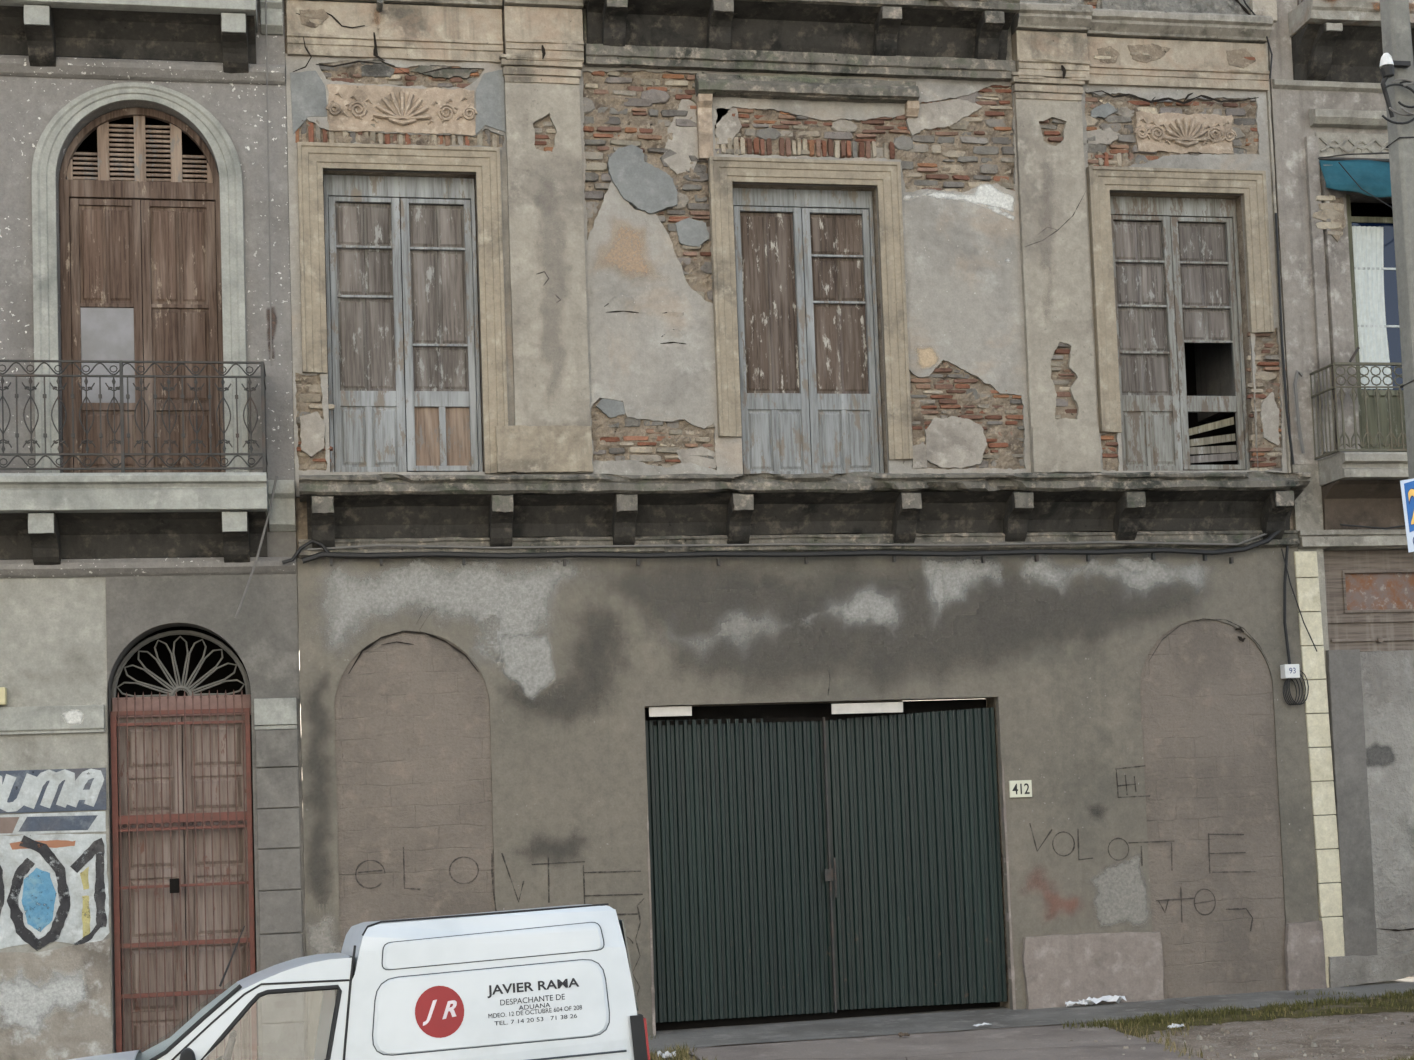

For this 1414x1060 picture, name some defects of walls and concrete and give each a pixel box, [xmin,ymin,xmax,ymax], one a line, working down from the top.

flaking render [319,60,484,88]
flaking render [295,119,504,147]
flaking render [1039,119,1065,146]
flaking render [1083,93,1259,167]
flaking render [582,71,1015,303]
flaking render [292,371,335,471]
flaking render [591,398,717,470]
flaking render [903,361,1025,470]
flaking render [1050,342,1077,419]
flaking render [1246,328,1286,471]
leakage [322,558,615,716]
leakage [628,554,1207,678]